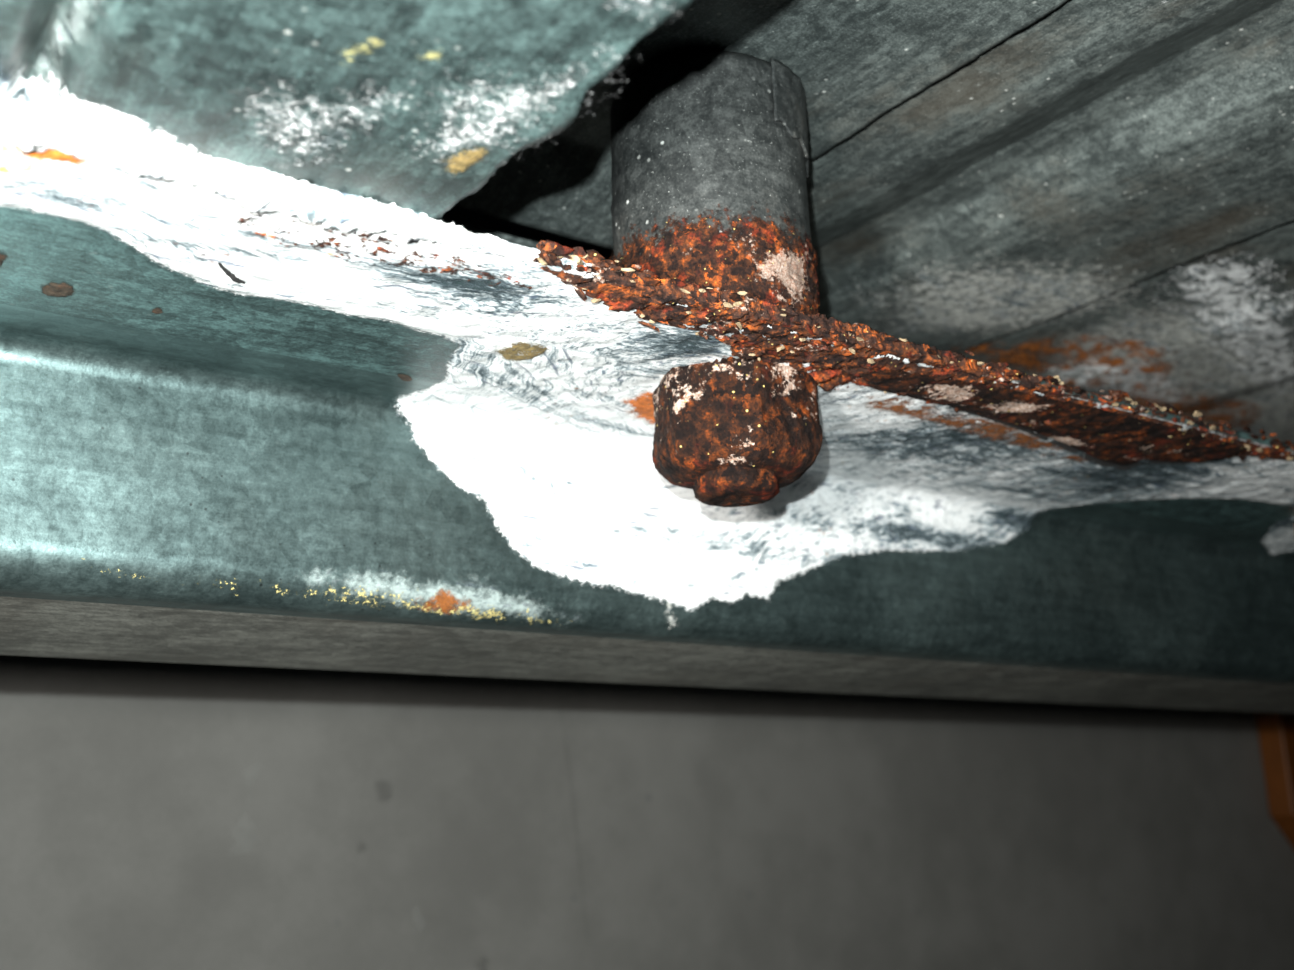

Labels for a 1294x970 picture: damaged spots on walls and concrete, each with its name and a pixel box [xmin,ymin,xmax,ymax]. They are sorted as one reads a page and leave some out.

leakage [260,85,363,166]
leakage [441,80,574,151]
leakage [498,342,547,361]
rust [0,55,1294,614]
leakage [304,585,558,625]